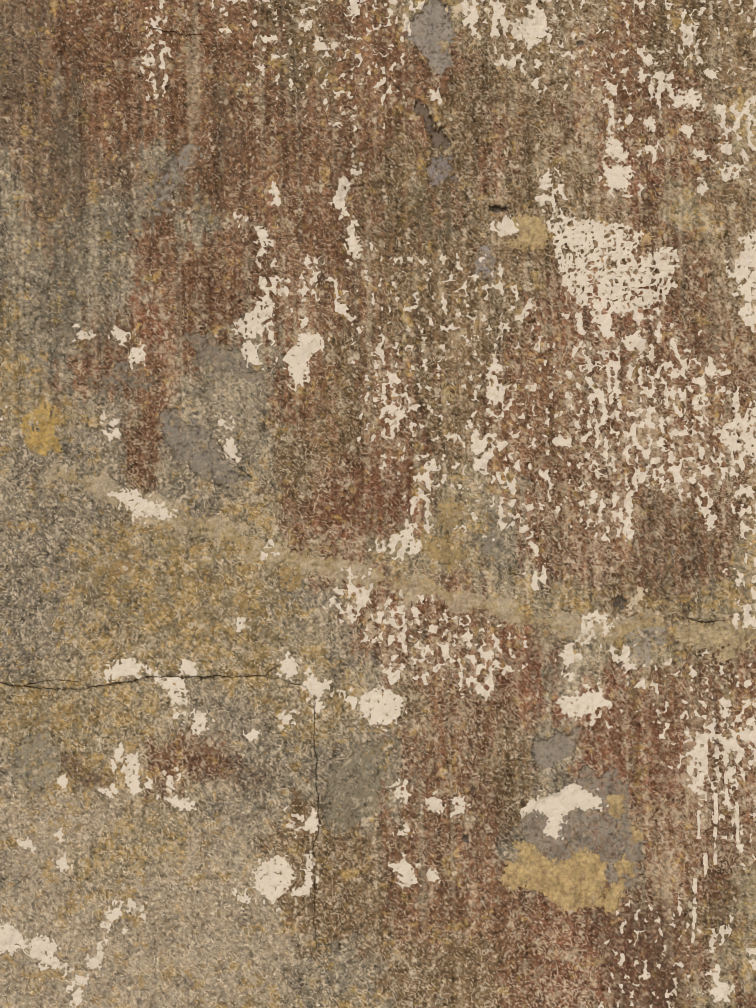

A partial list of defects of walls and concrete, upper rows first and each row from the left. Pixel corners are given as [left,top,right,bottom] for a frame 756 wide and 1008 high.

peeling [211,0,756,1008]
crack [0,665,327,948]
rust [595,718,622,753]
rust [601,910,678,1008]